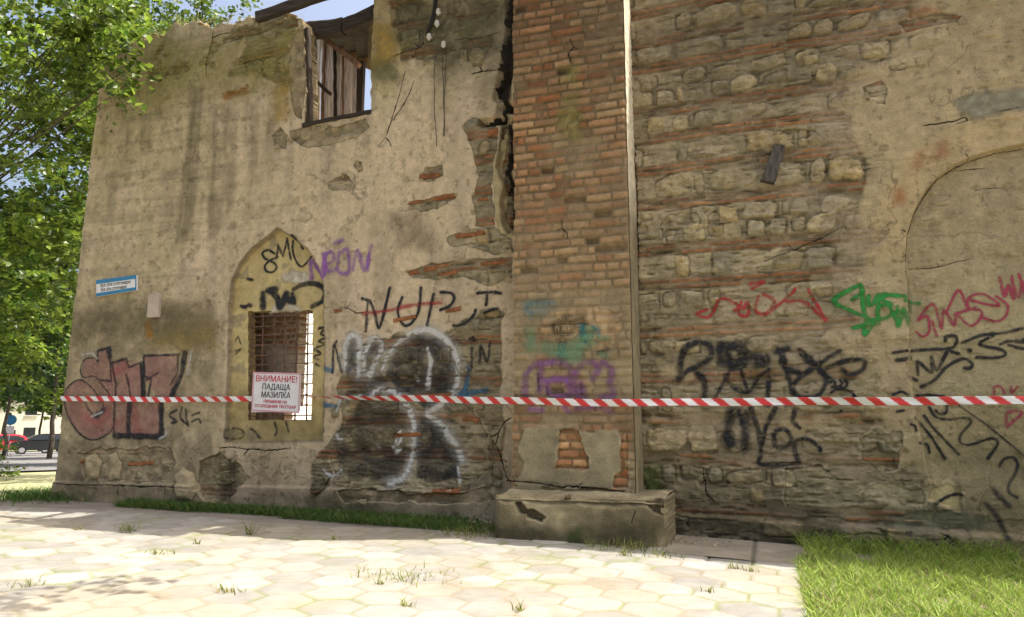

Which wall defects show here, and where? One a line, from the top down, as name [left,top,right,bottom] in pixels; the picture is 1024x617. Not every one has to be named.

spalling [272,26,369,150]
crack [453,0,515,233]
crack [924,117,968,126]
spalling [328,160,362,191]
spalling [408,118,515,286]
spalling [328,315,494,505]
spalling [77,446,176,484]
spalling [199,452,245,502]
crack [493,418,636,524]
spalling [556,429,588,470]
spalling [517,502,544,521]